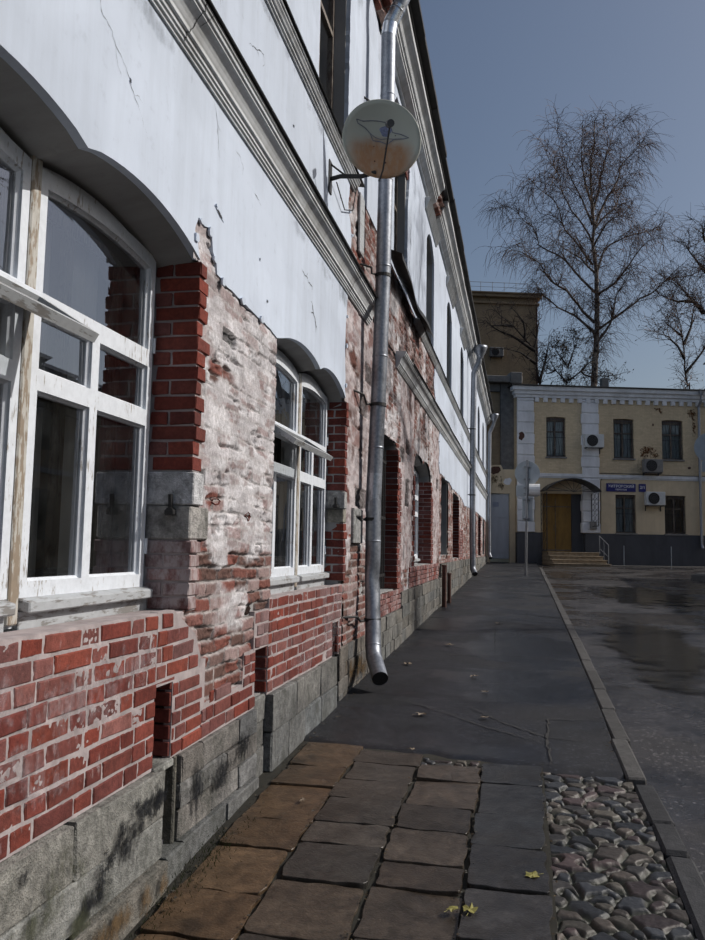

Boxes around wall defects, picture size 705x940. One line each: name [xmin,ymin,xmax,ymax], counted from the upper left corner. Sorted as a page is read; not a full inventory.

crack [184,1,221,41]
flaking render [348,187,377,291]
flaking render [182,218,277,703]
flaking render [341,297,374,646]
flaking render [380,267,486,614]
damp [189,733,250,812]
damp [72,786,168,940]